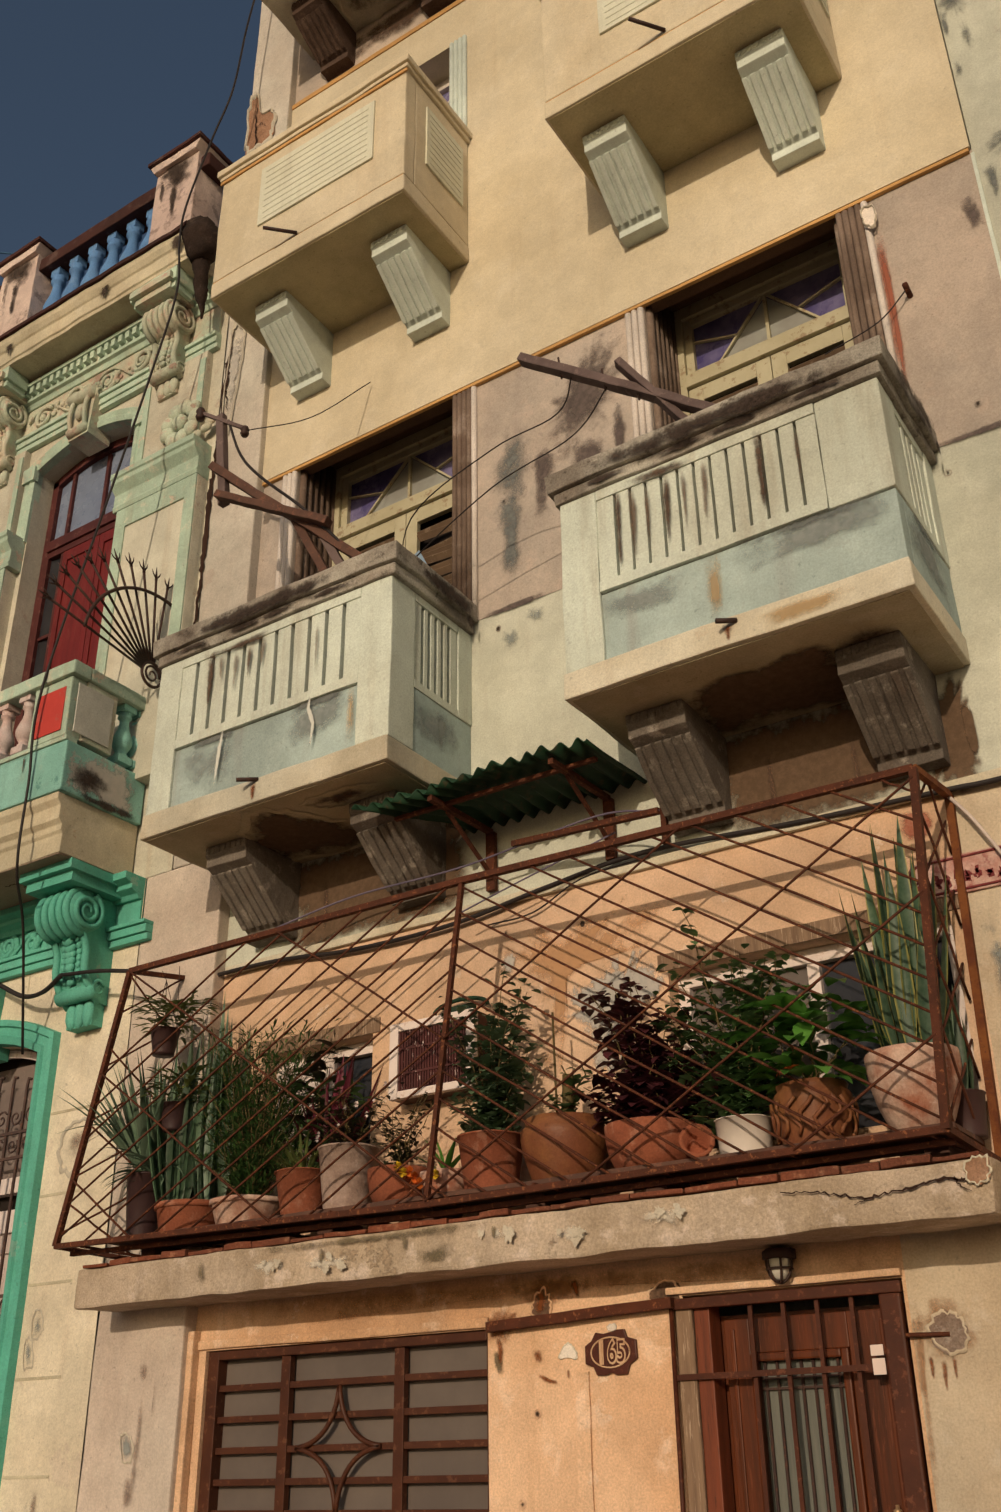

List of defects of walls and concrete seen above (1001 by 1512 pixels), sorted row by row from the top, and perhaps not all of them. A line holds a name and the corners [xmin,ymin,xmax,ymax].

mould [987,168,998,190]
water stain [554,347,839,561]
water stain [497,441,552,567]
water stain [777,503,878,553]
water stain [775,594,829,619]
water stain [296,692,339,735]
water stain [961,706,979,753]
water stain [193,731,231,776]
water stain [66,755,132,818]
crack [780,1176,972,1205]
spalling [963,1154,993,1187]
spalling [925,1309,971,1357]